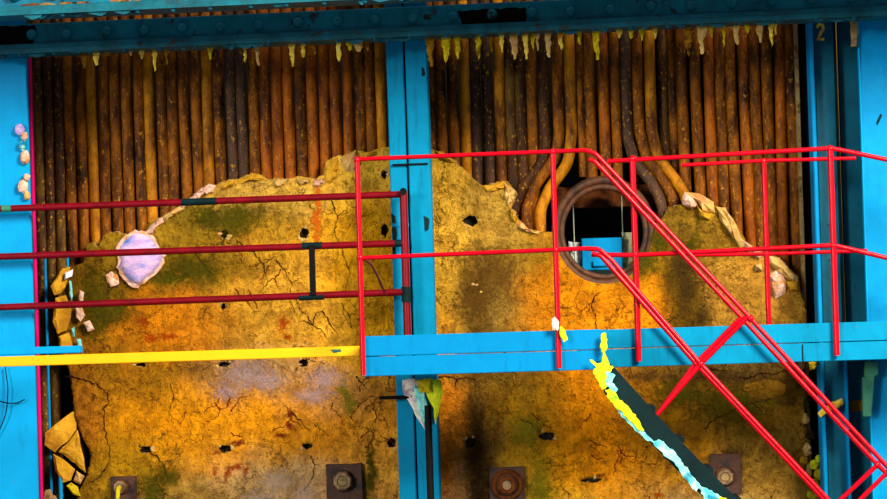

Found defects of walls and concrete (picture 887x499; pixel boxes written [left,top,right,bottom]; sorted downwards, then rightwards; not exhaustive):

peeling [475,26,657,60]
peeling [676,21,778,56]
spalling [106,150,377,288]
spalling [483,181,541,234]
spalling [681,192,799,299]
peeling [552,317,568,342]
crack [56,375,110,482]
crack [169,383,248,437]
crack [272,376,396,447]
crack [704,368,794,429]
crack [138,445,182,499]
corrosion [213,463,248,479]